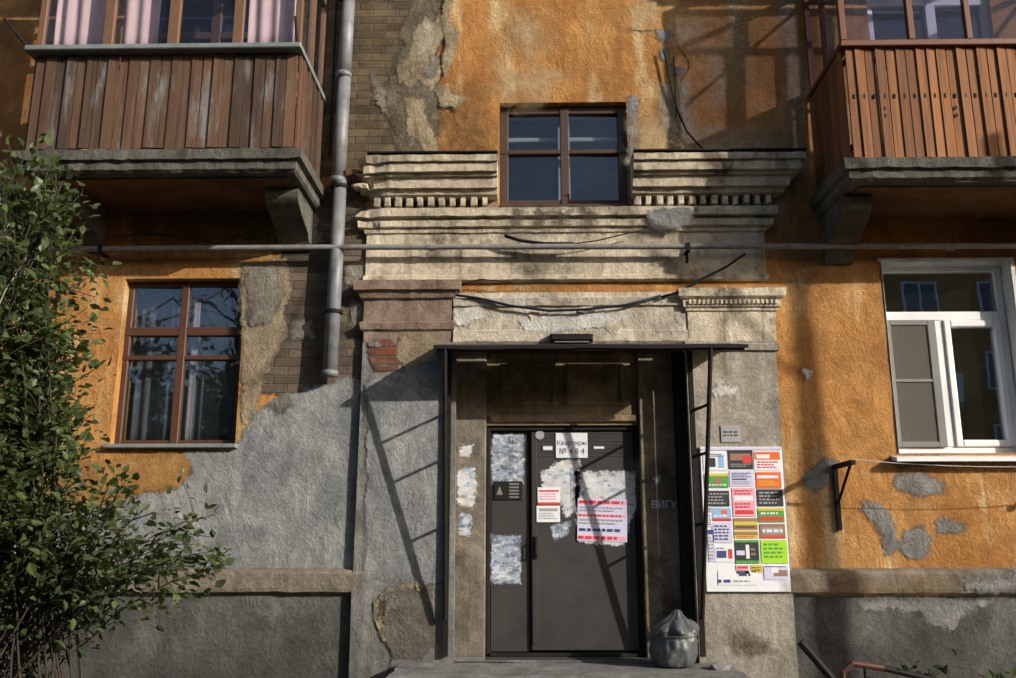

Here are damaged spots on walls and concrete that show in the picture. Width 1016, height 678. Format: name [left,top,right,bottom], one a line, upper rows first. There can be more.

flaking render [243,0,466,415]
water stain [513,206,569,233]
peeling [453,306,486,327]
spalling [890,455,948,469]
flaking render [374,581,437,674]